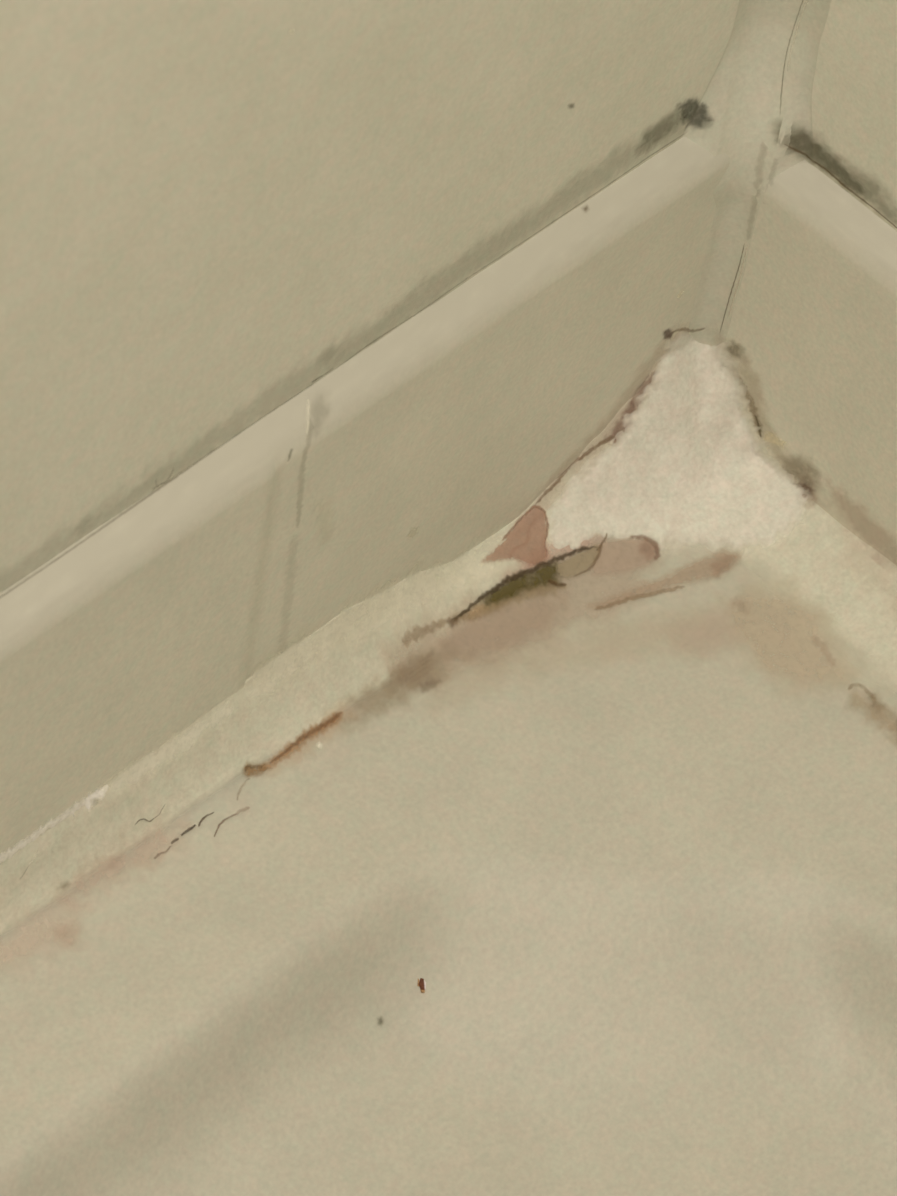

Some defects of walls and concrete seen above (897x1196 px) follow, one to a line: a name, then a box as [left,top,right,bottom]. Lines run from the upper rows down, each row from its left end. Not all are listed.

leakage [682,101,709,125]
crack [720,247,744,331]
peeling [486,506,548,564]
rust [245,714,339,776]